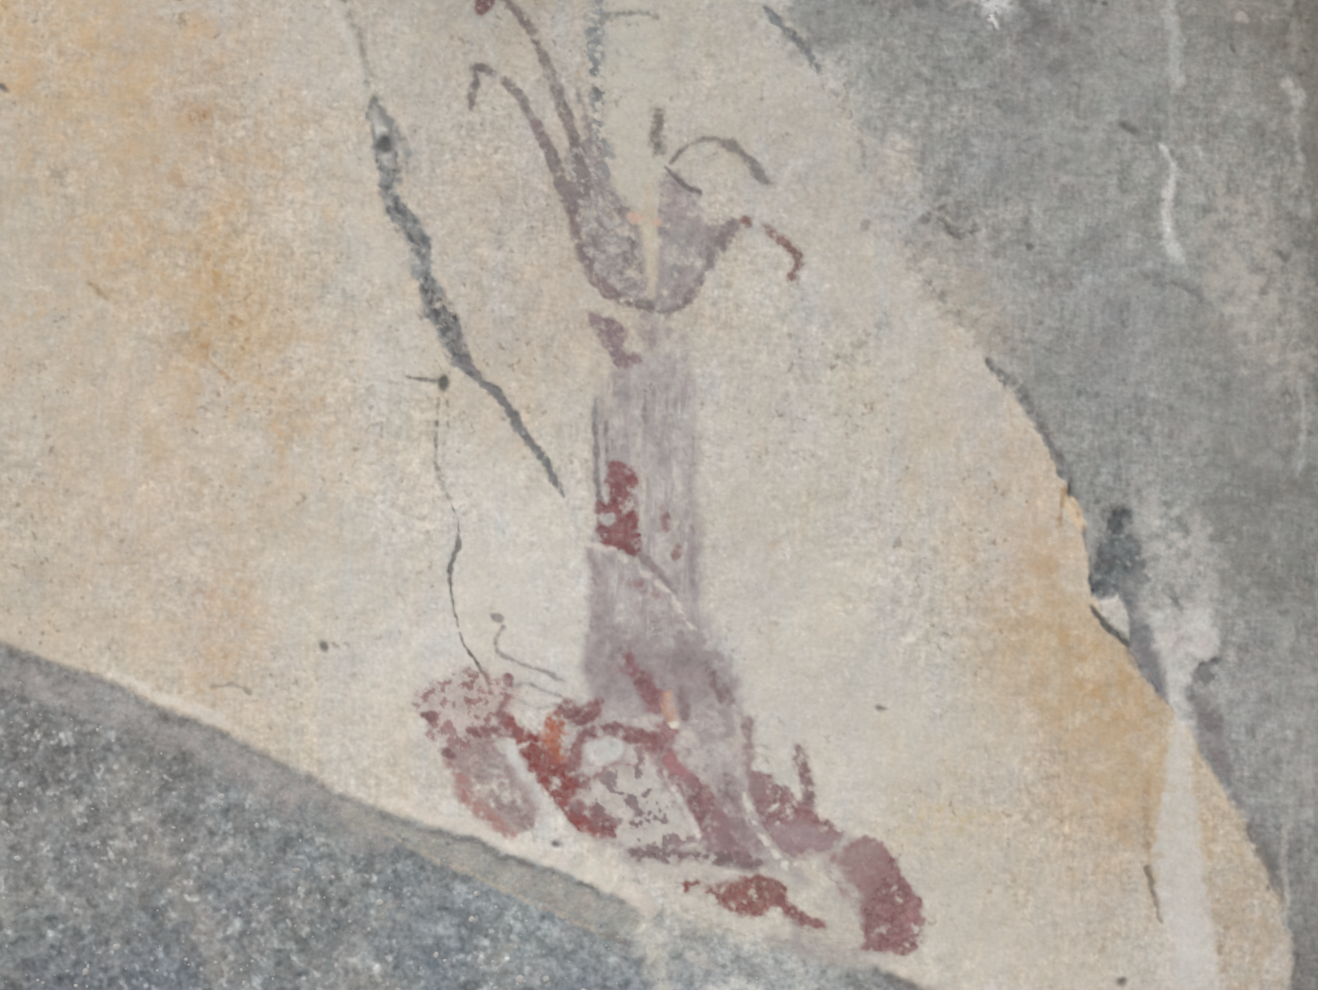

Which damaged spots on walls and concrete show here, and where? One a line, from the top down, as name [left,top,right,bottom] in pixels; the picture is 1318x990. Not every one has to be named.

spalling [943,0,1014,37]
spalling [1112,118,1146,142]
crack [318,0,568,665]
spalling [982,354,1163,695]
spalling [317,639,330,656]
spalling [1188,654,1282,898]
spalling [548,838,566,849]
spalling [1113,975,1131,990]